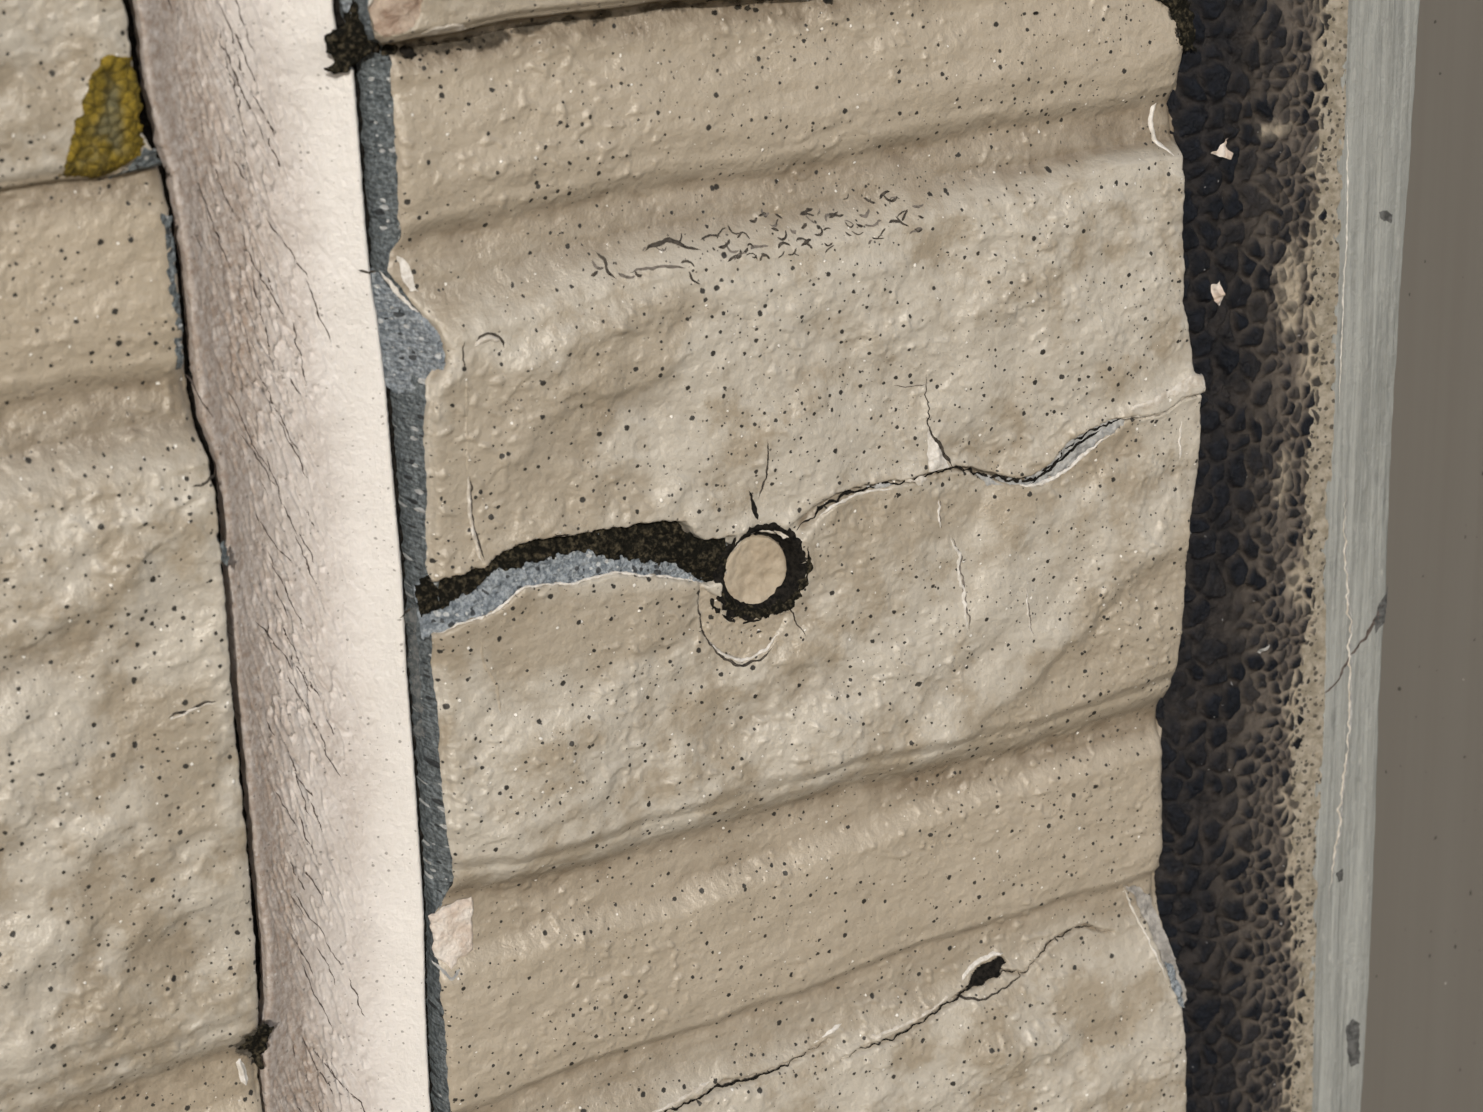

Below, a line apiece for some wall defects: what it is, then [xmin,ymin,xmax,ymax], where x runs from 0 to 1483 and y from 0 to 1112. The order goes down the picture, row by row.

crack [353,64,376,274]
crack [591,190,924,284]
crack [386,373,1206,1112]